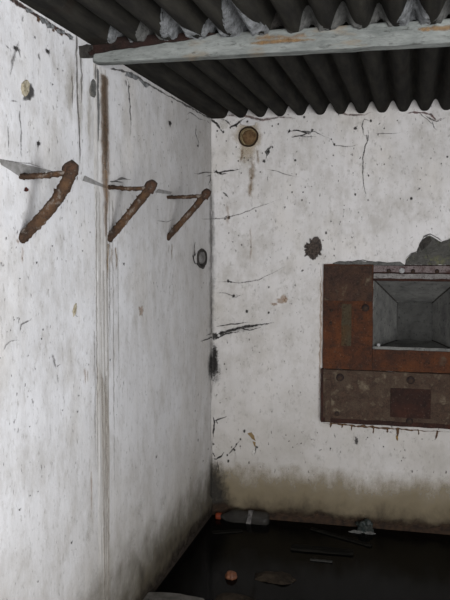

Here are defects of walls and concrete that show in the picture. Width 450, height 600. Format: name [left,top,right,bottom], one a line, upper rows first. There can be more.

damp [0,159,51,176]
damp [83,176,130,187]
crack [288,119,392,193]
spalling [333,234,450,266]
crack [203,322,268,341]
damp [208,345,218,381]
crack [213,417,225,471]
rust [327,423,426,441]
damp [109,466,450,600]